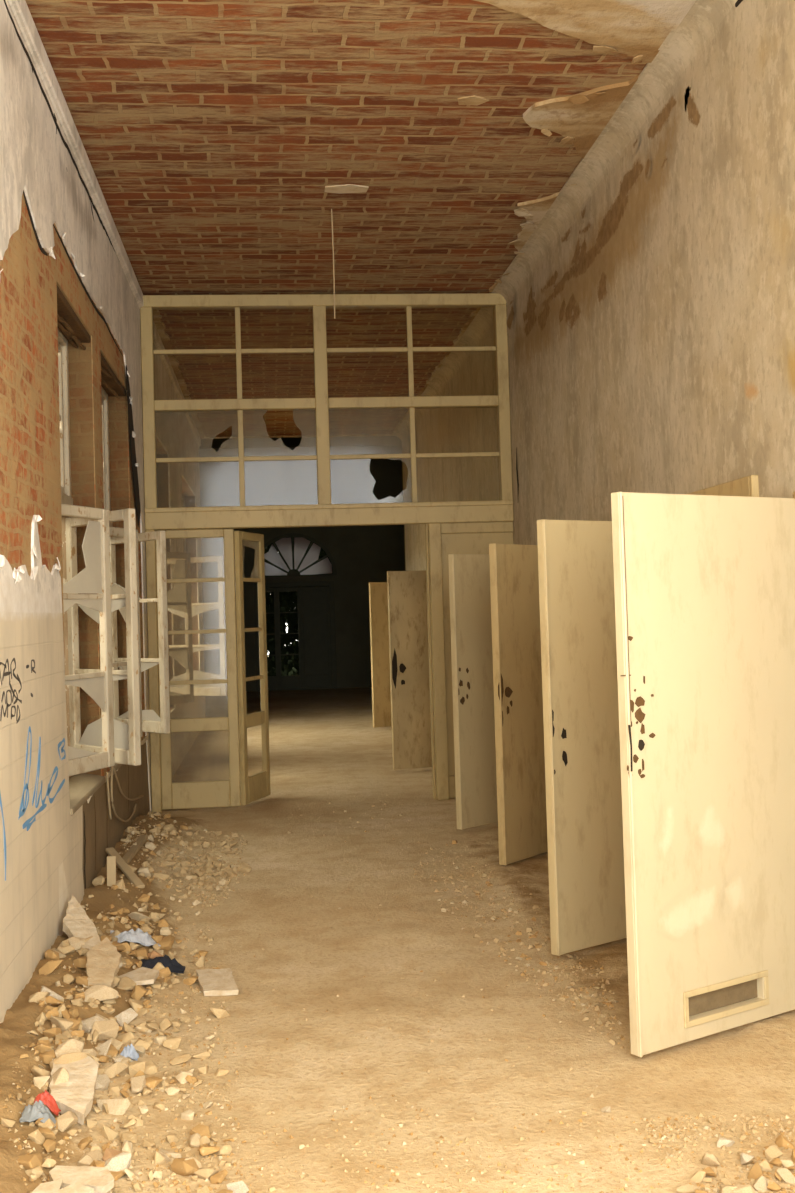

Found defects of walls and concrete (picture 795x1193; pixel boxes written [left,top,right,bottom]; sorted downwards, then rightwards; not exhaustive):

crack [3,0,119,260]
spalling [25,0,647,295]
peeling [506,72,701,376]
peeling [588,0,696,32]
peeling [0,190,145,710]
spalling [159,308,476,437]